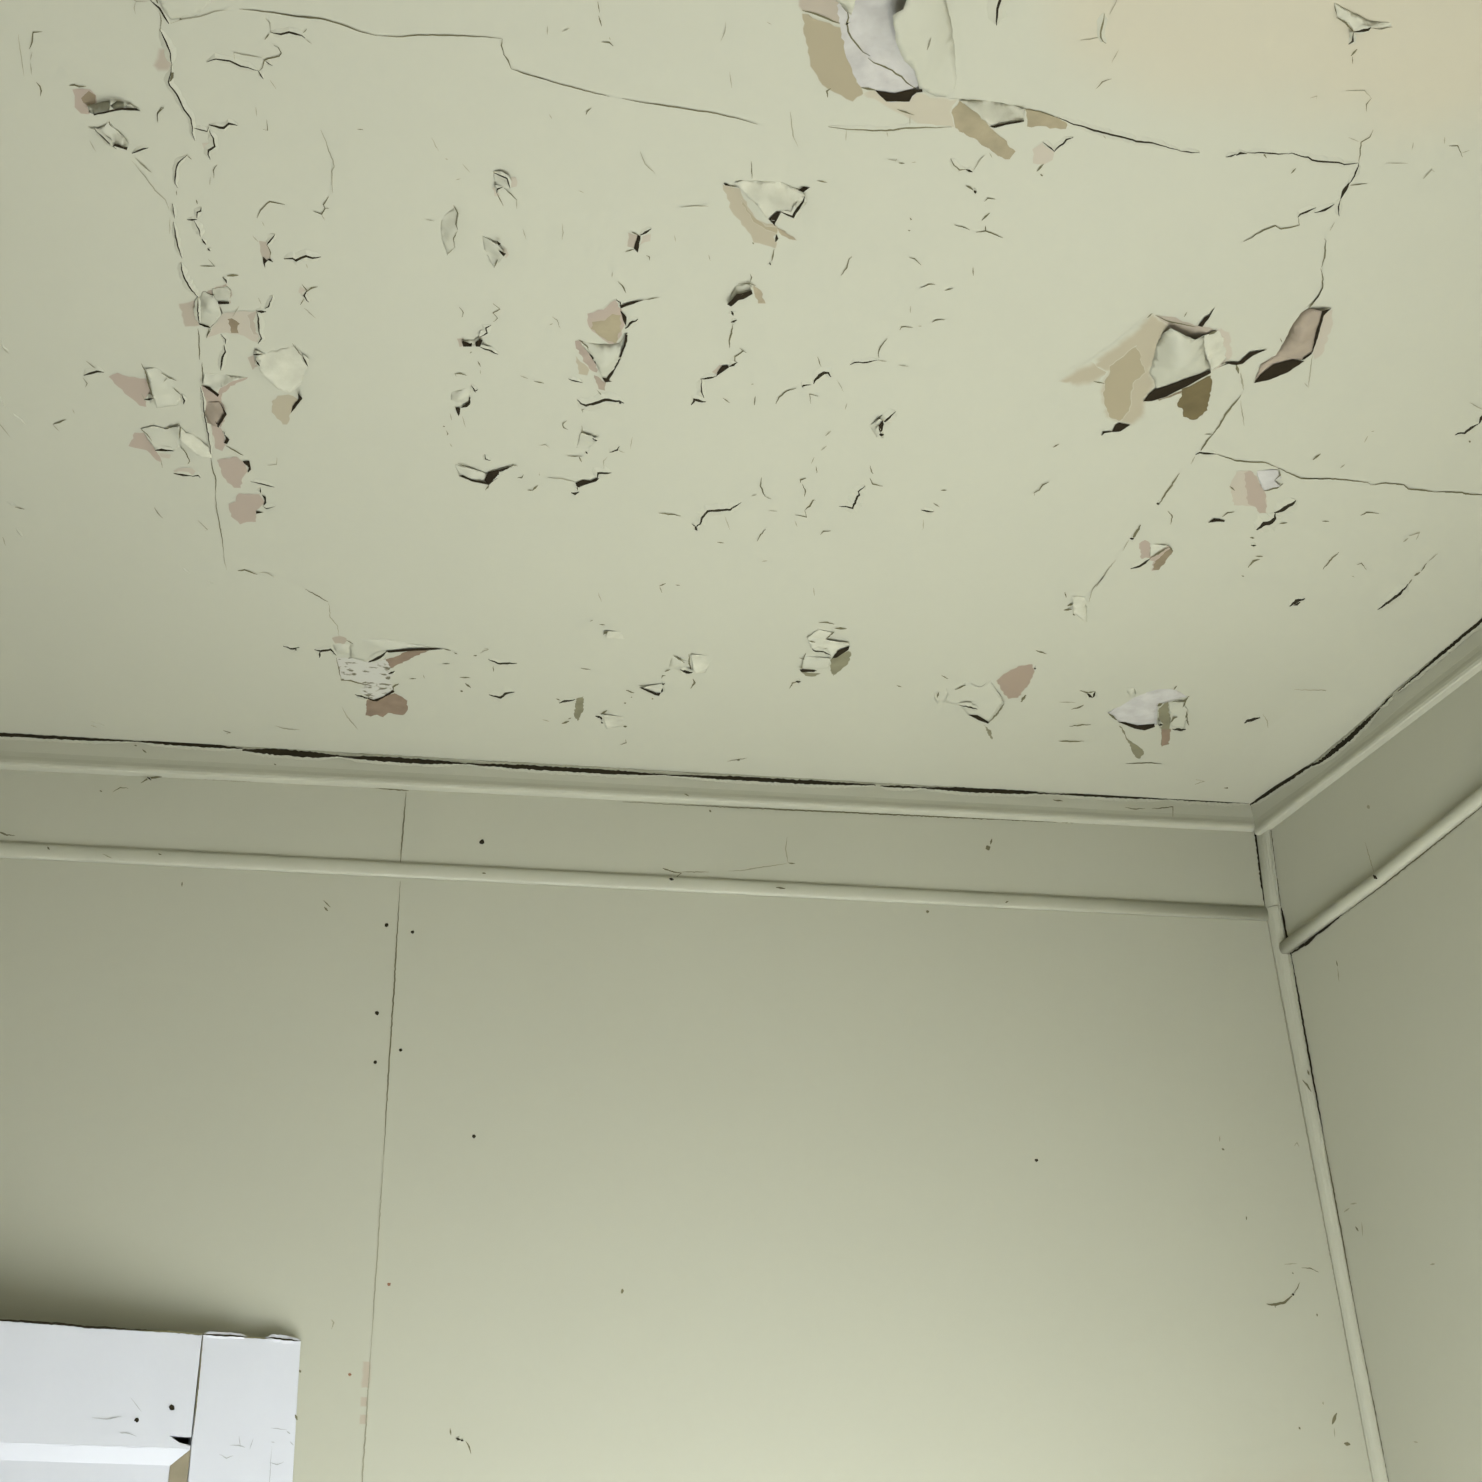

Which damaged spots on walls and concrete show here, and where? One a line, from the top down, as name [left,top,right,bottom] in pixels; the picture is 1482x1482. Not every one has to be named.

peeling [70,84,162,171]
peeling [797,0,1073,176]
crack [987,0,1011,26]
crack [1026,0,1469,308]
peeling [109,274,309,524]
crack [132,0,755,576]
peeling [575,273,655,390]
peeling [1057,289,1334,436]
crack [1089,395,1482,601]
crack [1352,554,1437,611]
peeling [314,636,451,717]
crack [0,618,1482,1482]